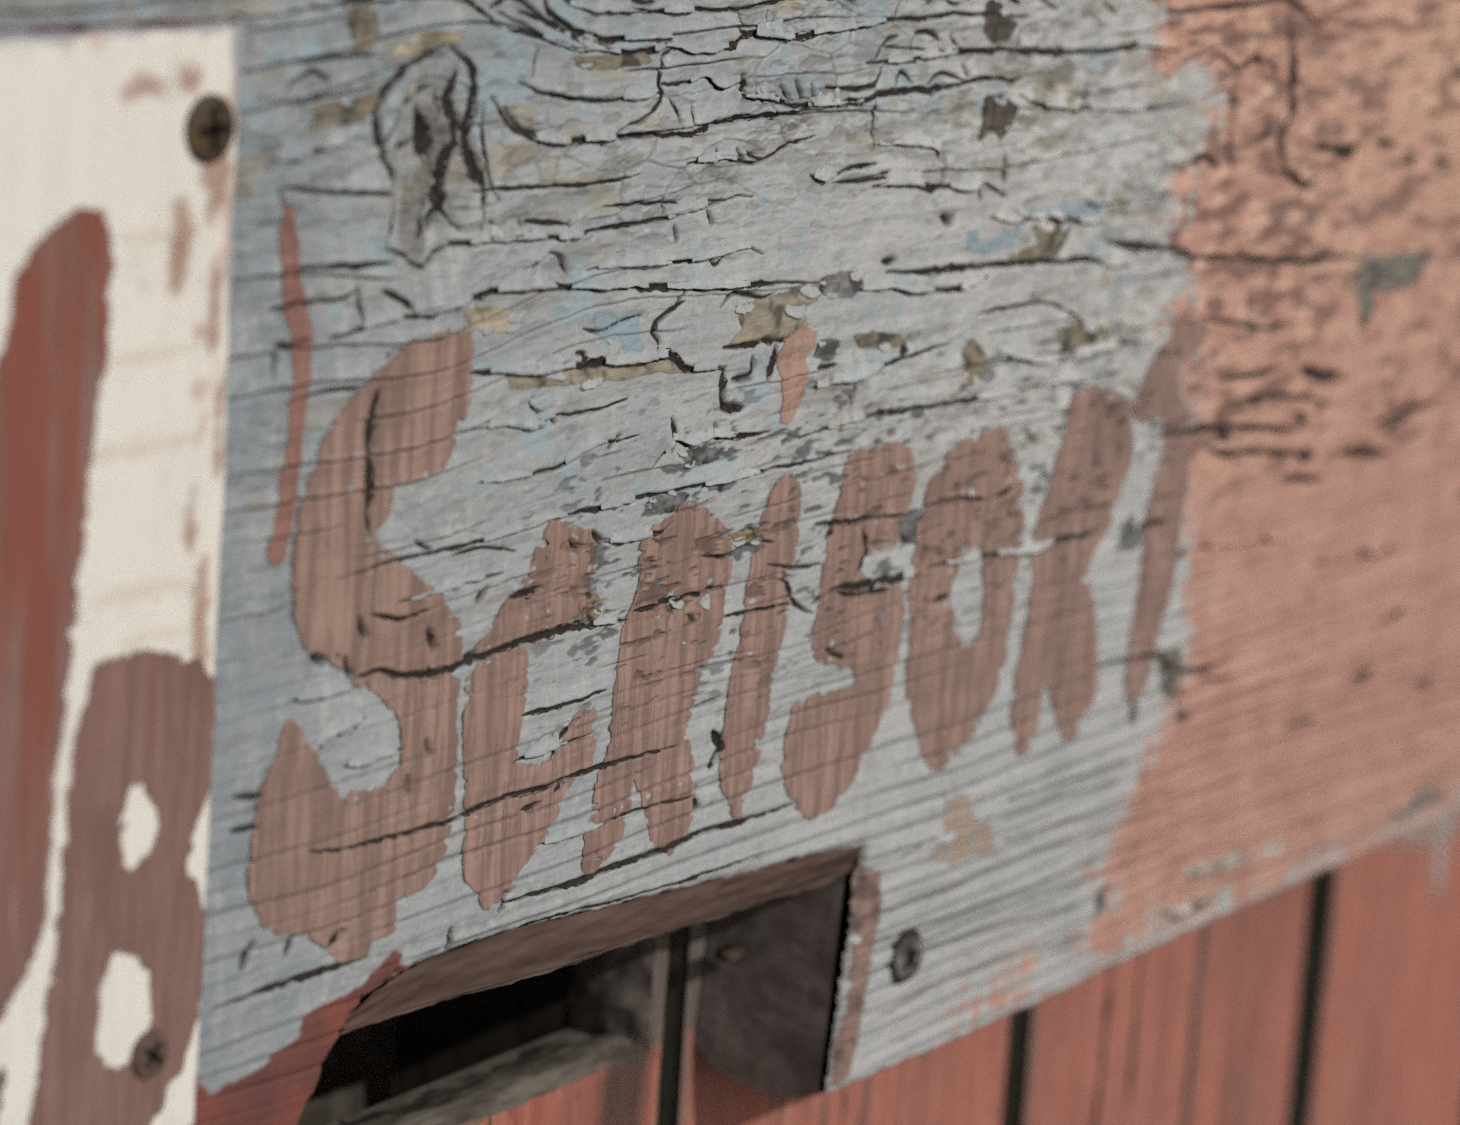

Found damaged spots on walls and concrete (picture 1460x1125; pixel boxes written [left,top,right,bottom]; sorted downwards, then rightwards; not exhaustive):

crack [228,0,392,17]
peeling [981,0,1018,43]
peeling [978,94,1019,142]
peeling [967,201,1100,261]
peeling [505,311,683,390]
peeling [730,267,904,362]
peeling [962,339,989,386]
peeling [1056,317,1112,356]
crack [271,0,1449,788]
peeling [678,446,723,468]
peeling [708,481,737,492]
peeling [830,867,882,1086]